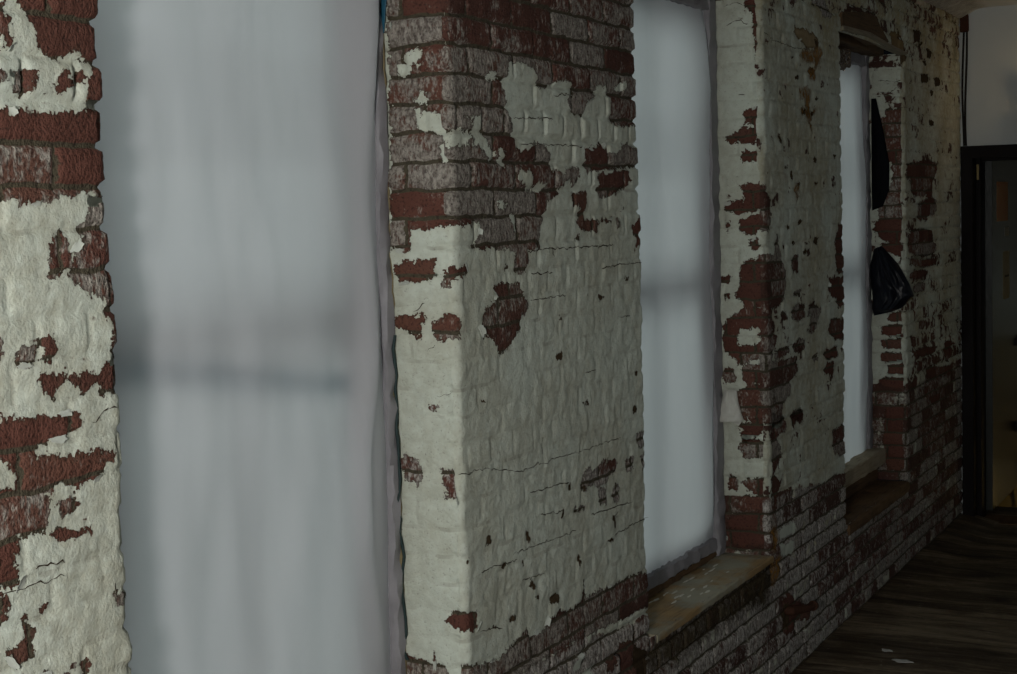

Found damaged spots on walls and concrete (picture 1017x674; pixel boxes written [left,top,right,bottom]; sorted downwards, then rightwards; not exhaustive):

peeling [384,0,638,357]
spalling [632,212,641,252]
peeling [725,106,758,163]
peeling [872,106,939,293]
peeling [0,0,117,671]
peeling [721,181,845,549]
peeling [879,310,953,406]
crack [459,437,647,580]
peeling [64,657,92,674]
peeling [406,650,449,674]
peeling [444,609,496,633]
peeling [461,554,649,674]